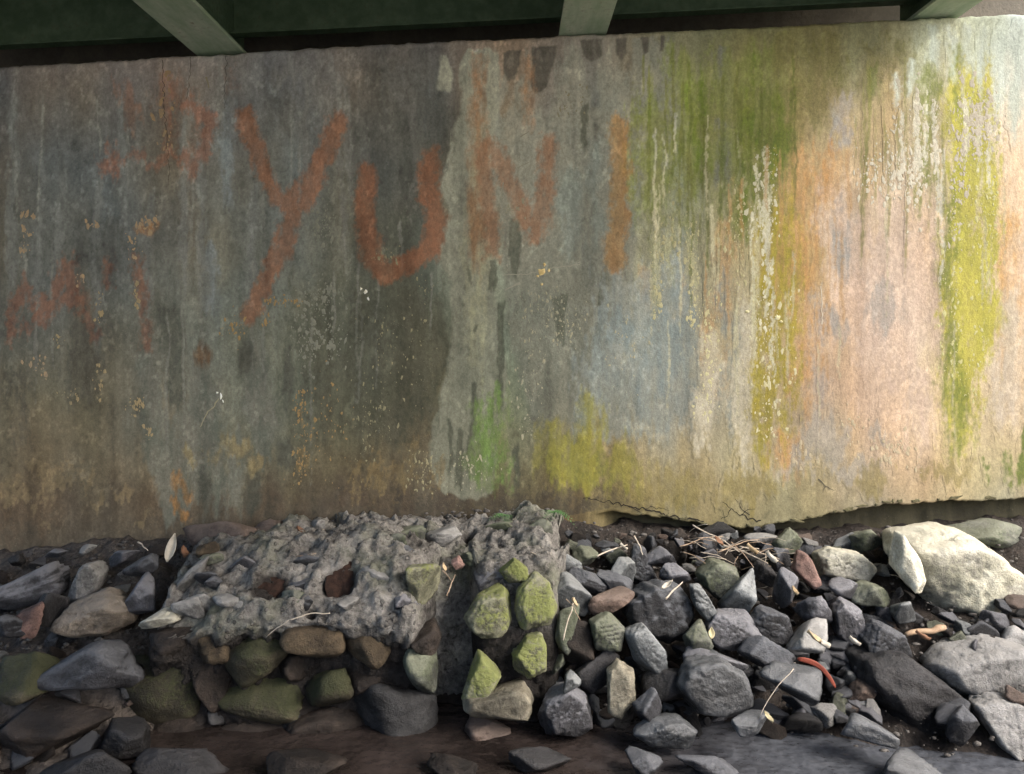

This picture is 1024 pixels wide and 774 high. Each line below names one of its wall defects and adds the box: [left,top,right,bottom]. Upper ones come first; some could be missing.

damp [0,34,910,552]
crack [588,498,761,523]
damp [889,18,1024,456]